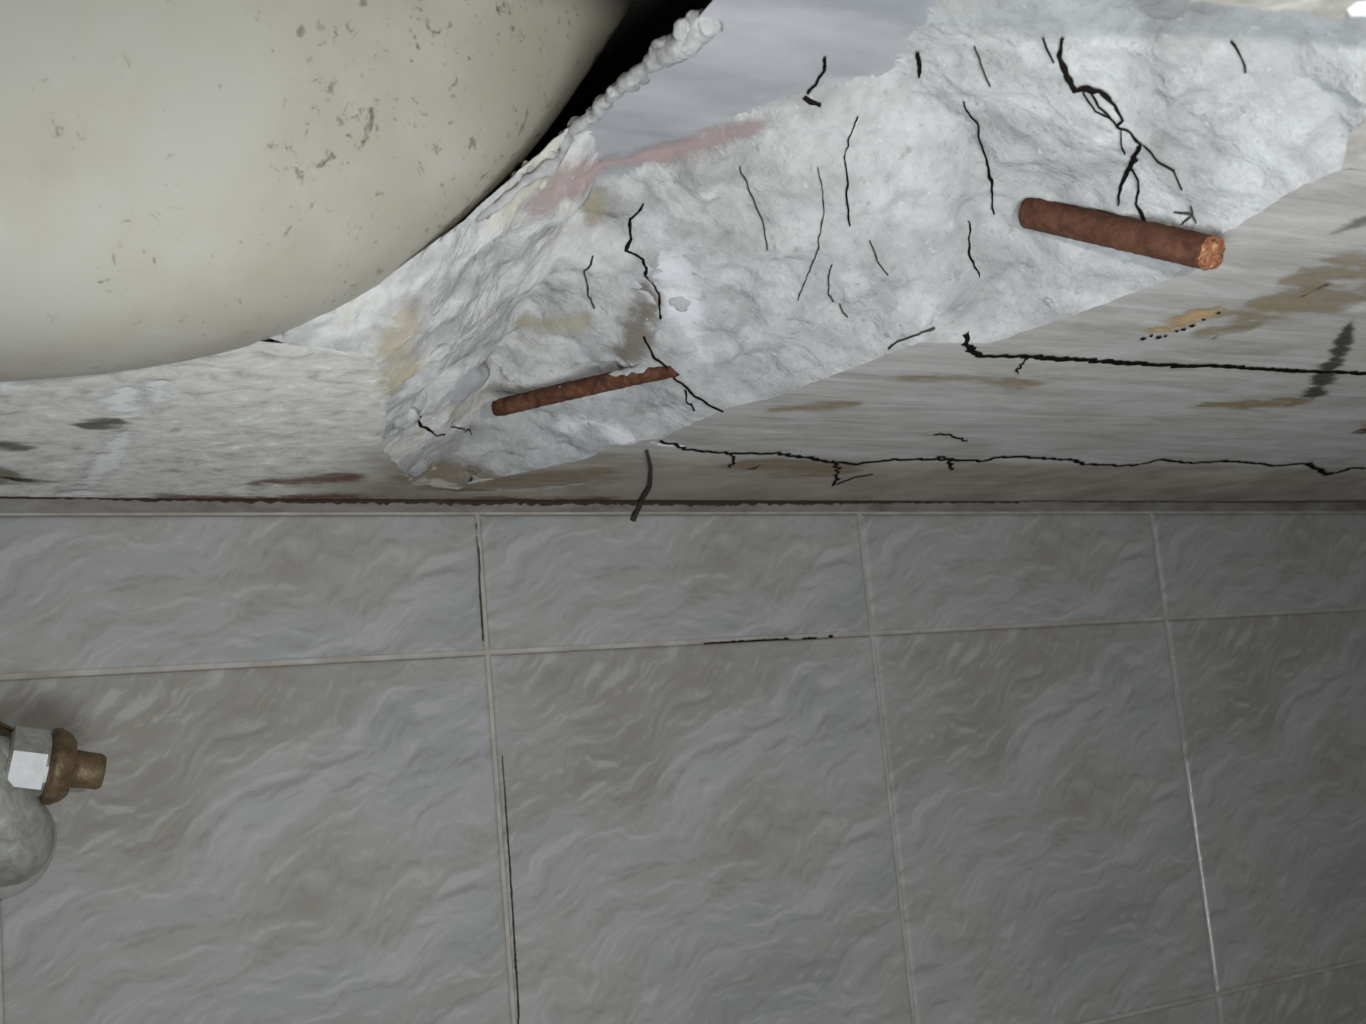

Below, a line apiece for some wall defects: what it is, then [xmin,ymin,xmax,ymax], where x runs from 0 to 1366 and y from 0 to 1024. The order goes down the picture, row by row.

crack [1230,41,1246,73]
crack [963,46,995,278]
crack [1042,37,1197,226]
crack [740,166,768,250]
spalling [270,0,1366,485]
crack [798,116,889,318]
crack [583,204,723,412]
damp [1140,257,1366,341]
crack [888,327,1366,376]
crack [418,416,472,437]
crack [660,433,1366,487]
damp [1196,399,1304,408]